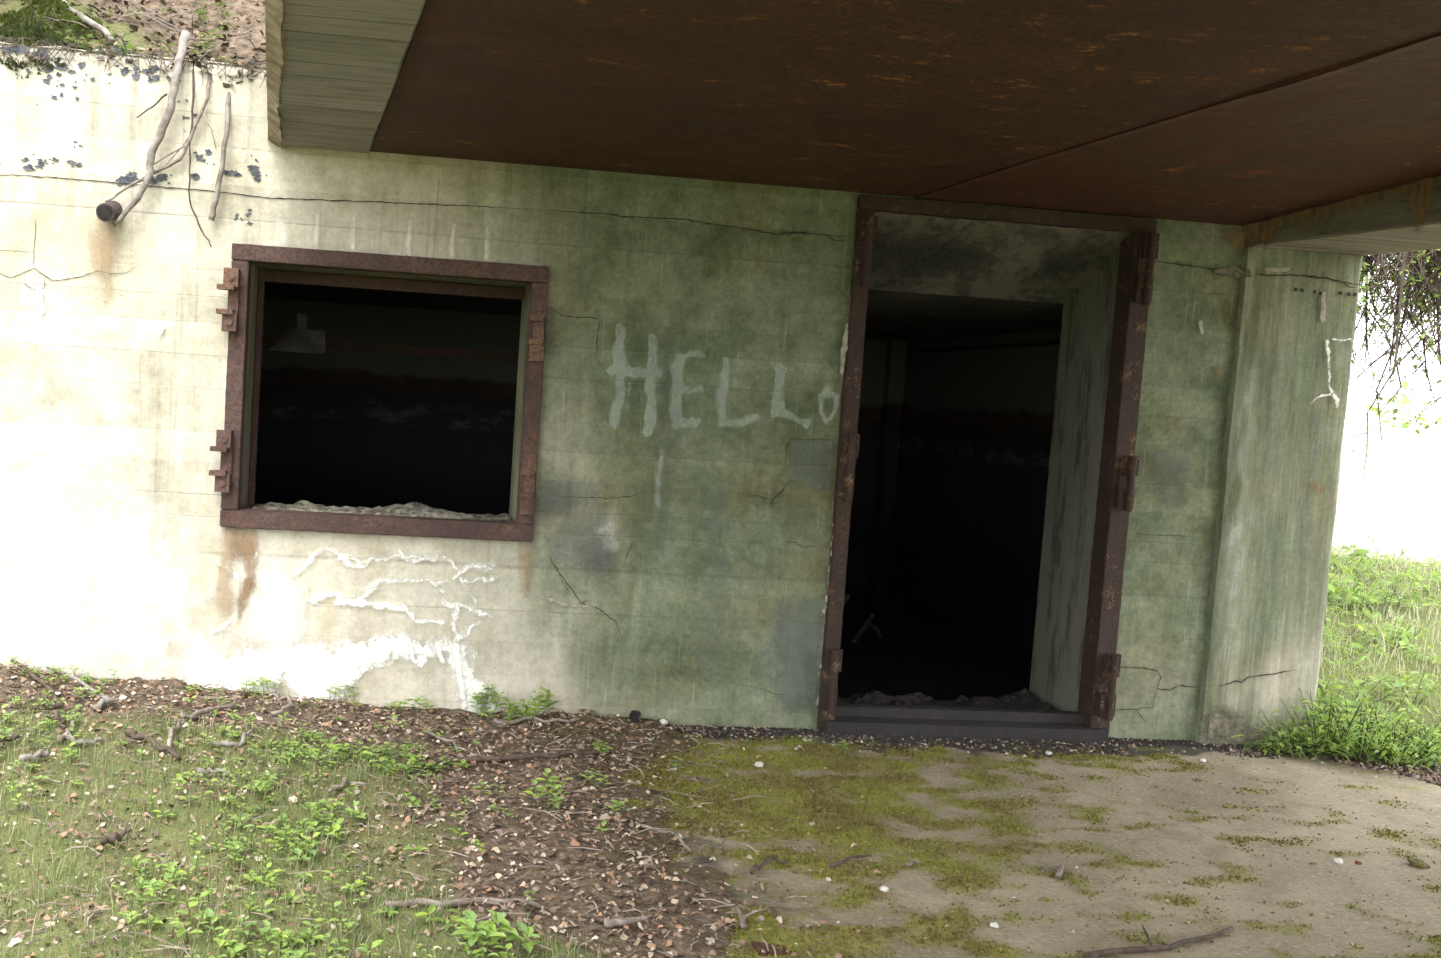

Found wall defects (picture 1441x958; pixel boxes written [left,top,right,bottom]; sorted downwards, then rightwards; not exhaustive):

crack [0,174,846,241]
crack [0,220,137,291]
crack [1155,261,1359,288]
corrosion [231,532,257,618]
water stain [0,461,496,713]
crack [549,554,622,640]
crack [1115,667,1294,720]